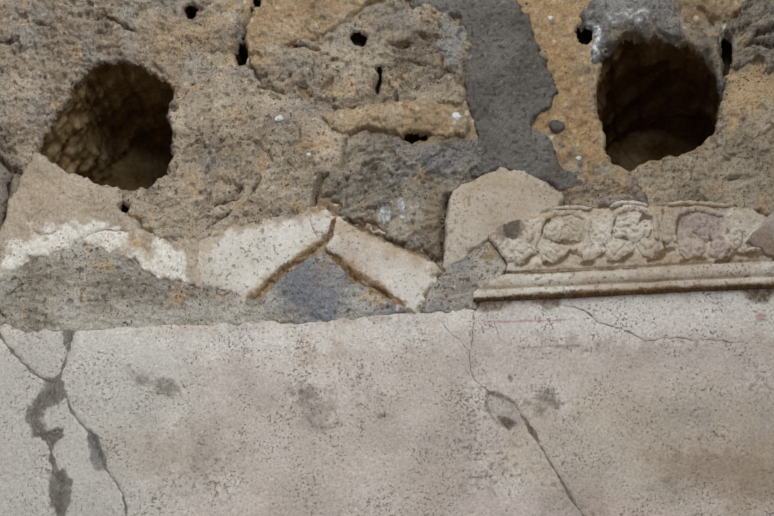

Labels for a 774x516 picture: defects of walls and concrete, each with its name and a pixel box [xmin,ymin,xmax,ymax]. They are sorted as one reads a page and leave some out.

spalling [212,181,260,225]
spalling [0,241,407,333]
spalling [419,241,507,313]
crack [569,306,747,343]
crack [0,311,127,516]
crack [515,405,585,516]